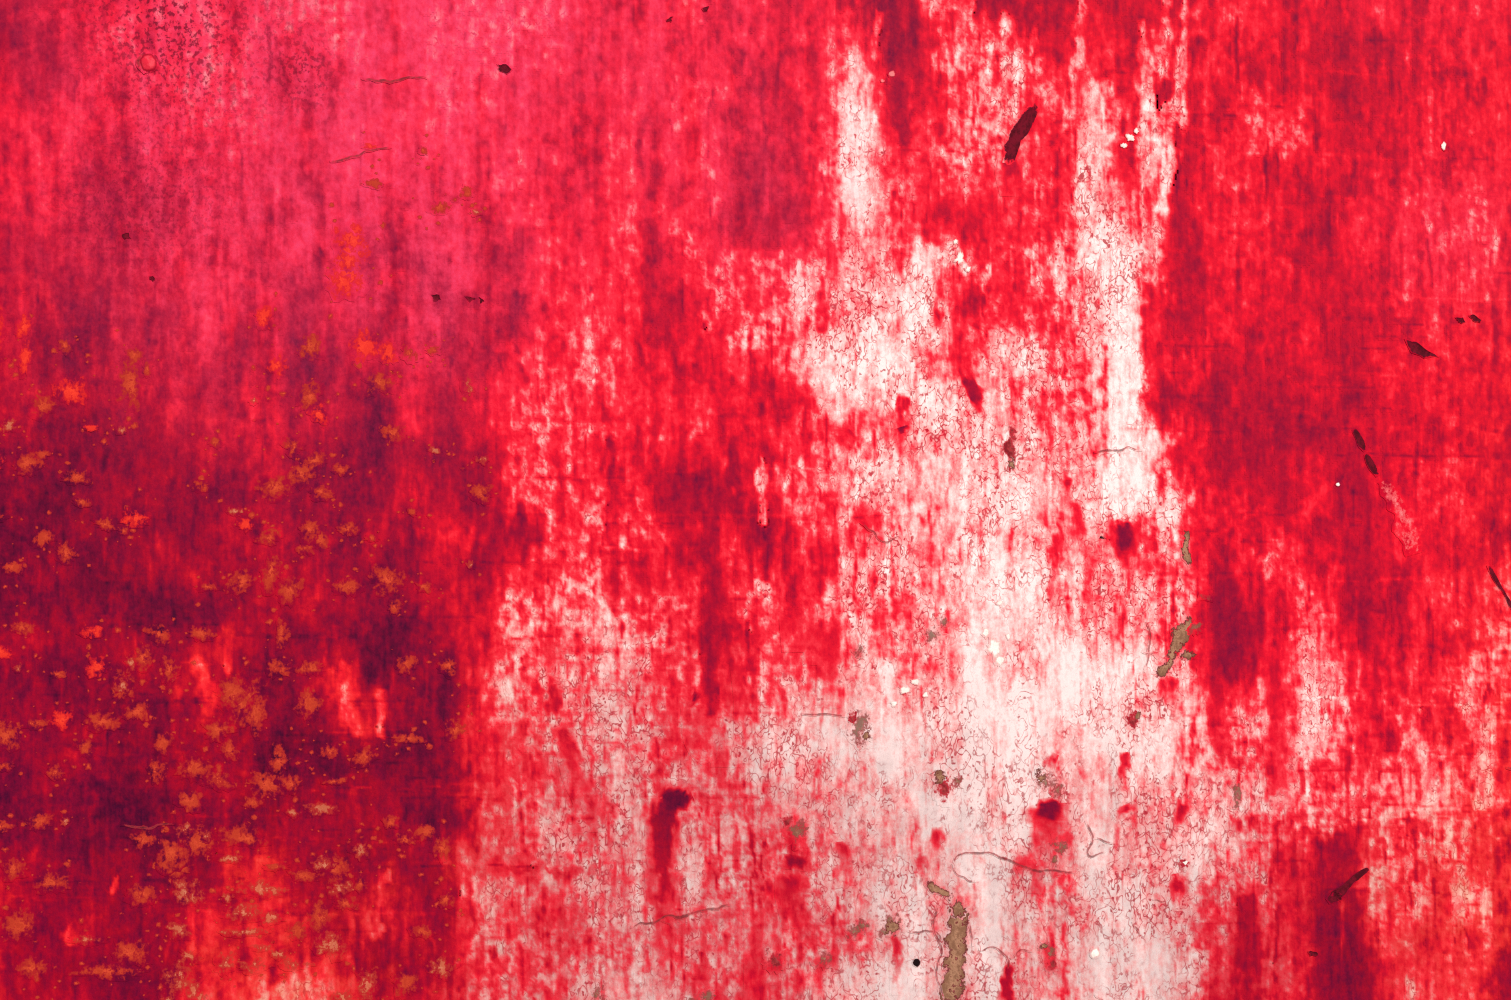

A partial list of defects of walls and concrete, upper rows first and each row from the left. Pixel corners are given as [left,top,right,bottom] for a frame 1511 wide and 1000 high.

peeling [116,0,368,163]
peeling [401,0,571,146]
corrosion [0,202,499,1000]
peeling [459,0,1511,1000]